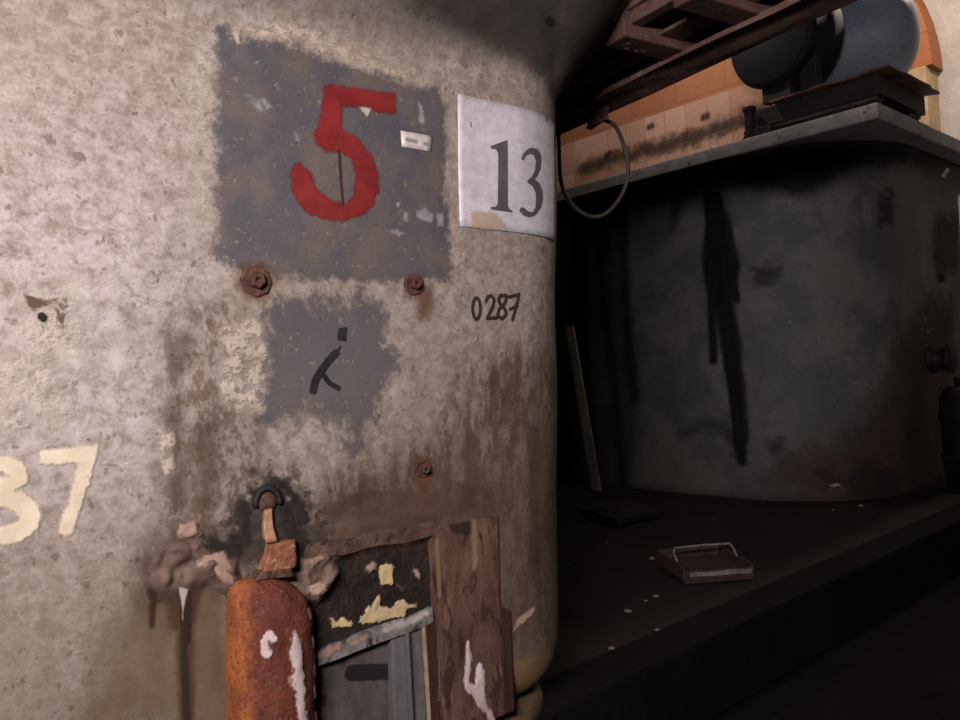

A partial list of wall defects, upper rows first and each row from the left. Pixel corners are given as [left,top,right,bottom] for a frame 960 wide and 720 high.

water stain [702,191,748,465]
water stain [92,587,226,720]
peeling [177,520,202,538]
peeling [196,551,235,585]
water stain [170,313,309,557]
peeling [309,581,328,596]
water stain [391,361,551,640]